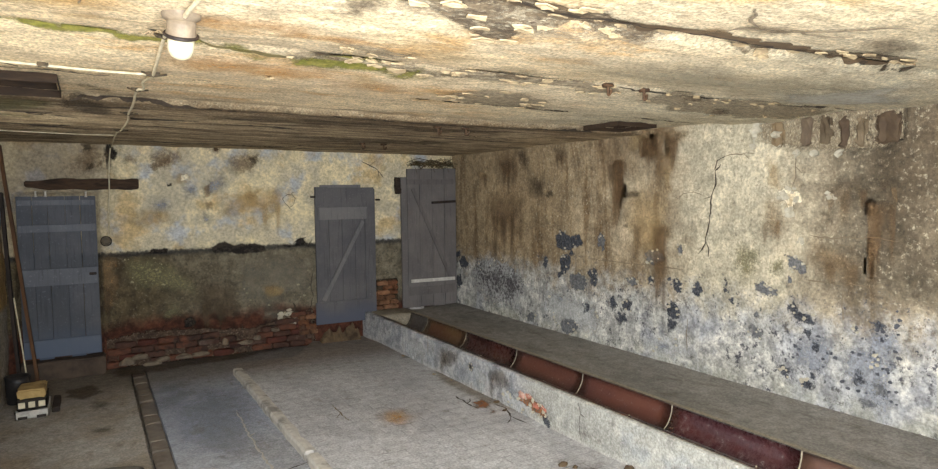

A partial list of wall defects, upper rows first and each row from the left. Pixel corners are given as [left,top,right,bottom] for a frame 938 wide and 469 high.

spalling [402,0,649,45]
spalling [815,50,917,72]
flaking render [749,102,905,158]
crack [681,153,753,257]
flaking render [104,308,318,369]
peeling [555,230,598,312]
peeling [609,295,633,326]
peeling [666,277,703,340]
peeling [754,281,778,297]
peeling [778,300,837,390]
peeling [840,350,902,409]
flaking render [495,390,550,429]